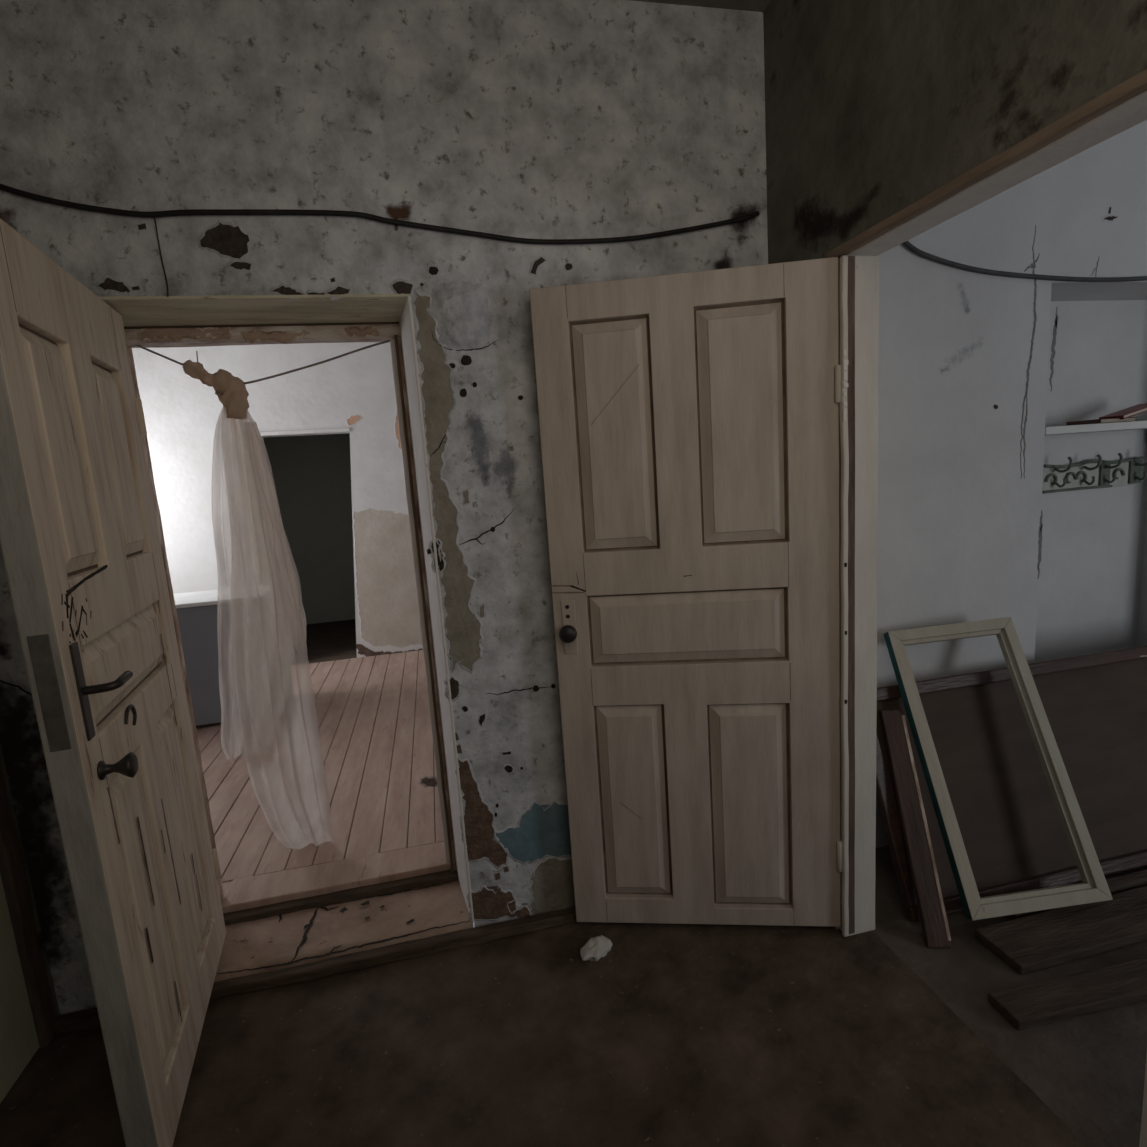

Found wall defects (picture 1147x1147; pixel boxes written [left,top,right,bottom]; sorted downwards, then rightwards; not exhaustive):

flaking render [198,220,254,272]
crack [1020,225,1058,479]
peeling [390,266,487,727]
crack [458,508,515,545]
flaking render [455,732,575,922]
crack [218,882,470,974]